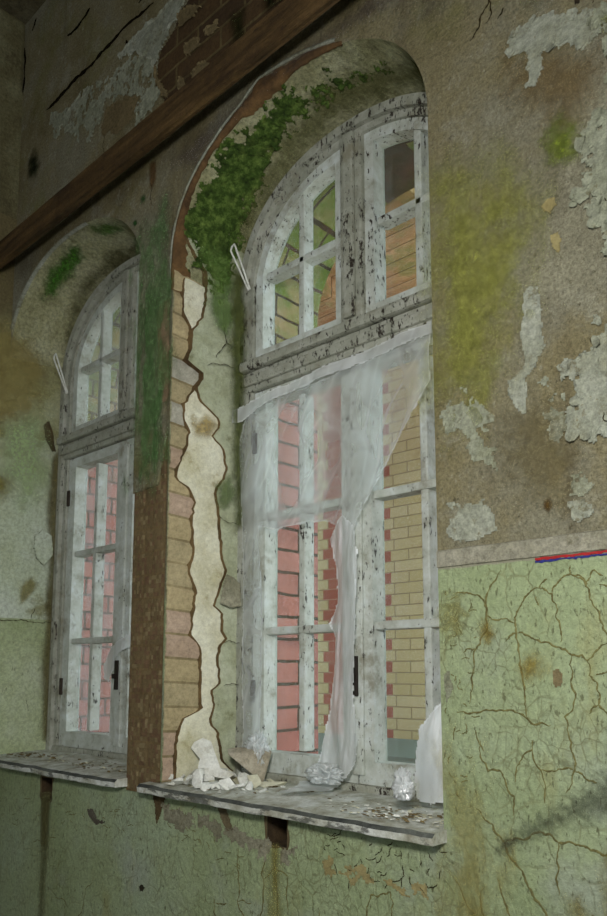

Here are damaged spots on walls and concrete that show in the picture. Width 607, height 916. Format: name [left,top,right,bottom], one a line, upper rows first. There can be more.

crack [22,19,36,91]
crack [47,0,153,110]
spalling [49,0,283,143]
peeling [504,0,607,89]
peeling [569,108,607,255]
spalling [126,38,343,792]
peeling [439,387,498,472]
peeling [507,285,607,444]
peeling [446,499,497,542]
peeling [567,471,594,522]
crack [324,567,607,916]
crack [167,807,289,916]